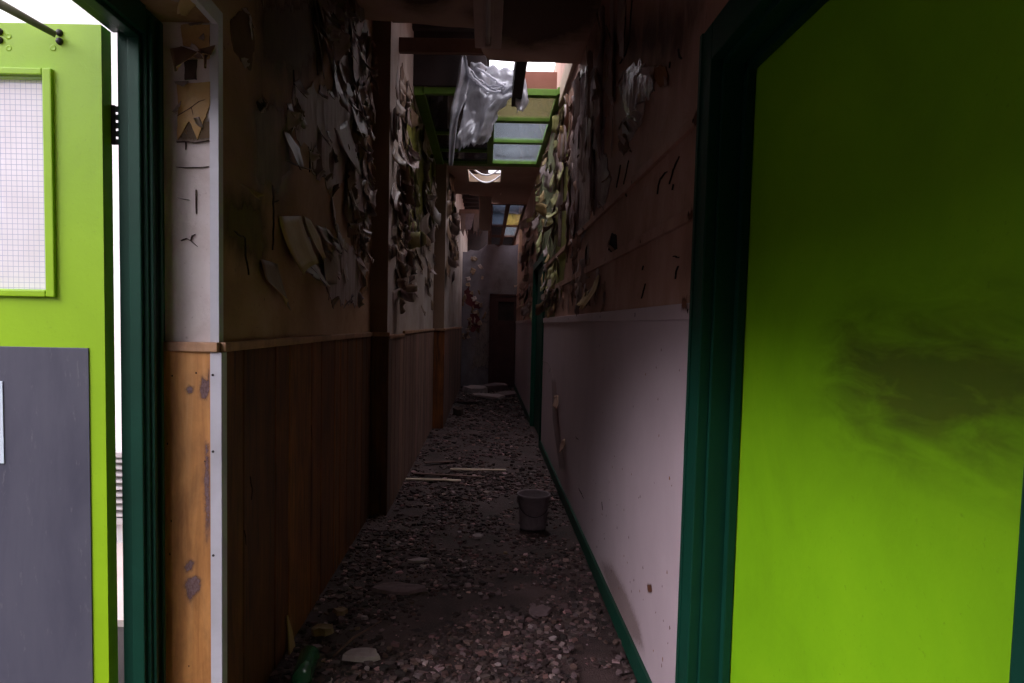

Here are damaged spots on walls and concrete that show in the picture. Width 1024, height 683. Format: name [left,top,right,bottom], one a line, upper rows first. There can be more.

peeling [170,0,215,140]
peeling [279,0,380,309]
peeling [389,63,486,335]
peeling [514,0,655,322]
leakage [854,345,1024,426]